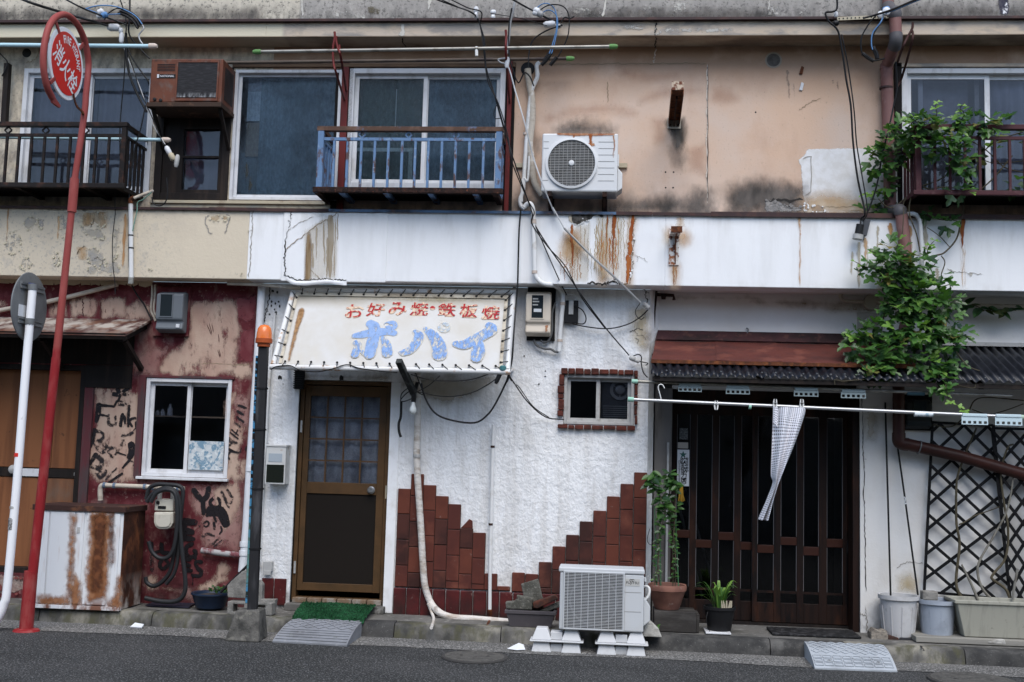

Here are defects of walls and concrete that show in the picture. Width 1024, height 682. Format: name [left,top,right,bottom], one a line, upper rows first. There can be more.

damp [670,119,685,149]
damp [731,182,880,213]
peeling [0,215,43,284]
peeling [41,211,153,320]
crack [248,211,346,322]
corrosion [560,224,582,281]
corrosion [594,215,634,284]
peeling [134,295,257,379]
peeling [90,388,138,483]
peeling [194,393,249,552]
peeling [181,563,229,597]